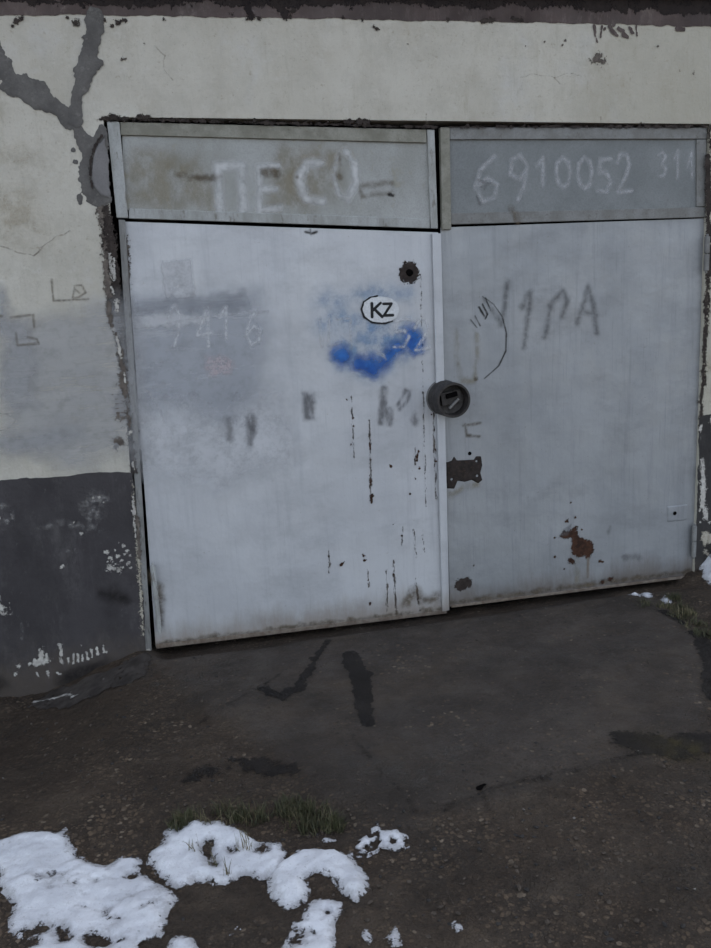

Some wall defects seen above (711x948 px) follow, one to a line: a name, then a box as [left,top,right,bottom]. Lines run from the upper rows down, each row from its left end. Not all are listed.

spalling [589,23,638,65]
crack [0,6,112,208]
spalling [98,113,711,433]
spalling [95,203,146,636]
rust [414,364,438,504]
rust [369,560,402,617]
rust [454,577,541,602]
rust [553,516,604,570]
peeling [698,457,711,556]
peeling [14,643,108,678]